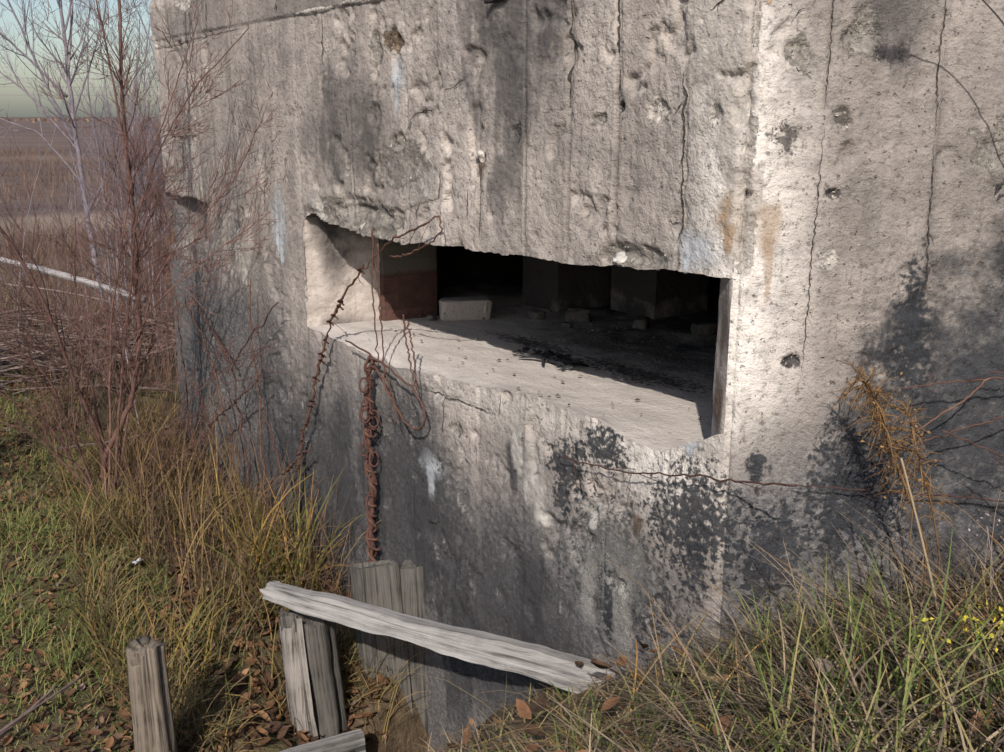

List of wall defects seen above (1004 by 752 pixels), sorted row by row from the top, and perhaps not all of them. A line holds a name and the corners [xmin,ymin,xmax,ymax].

spalling [370,26,405,64]
crack [617,0,625,111]
crack [670,70,688,248]
crack [791,0,834,374]
crack [924,3,947,306]
water stain [574,435,587,465]
water stain [814,299,946,579]